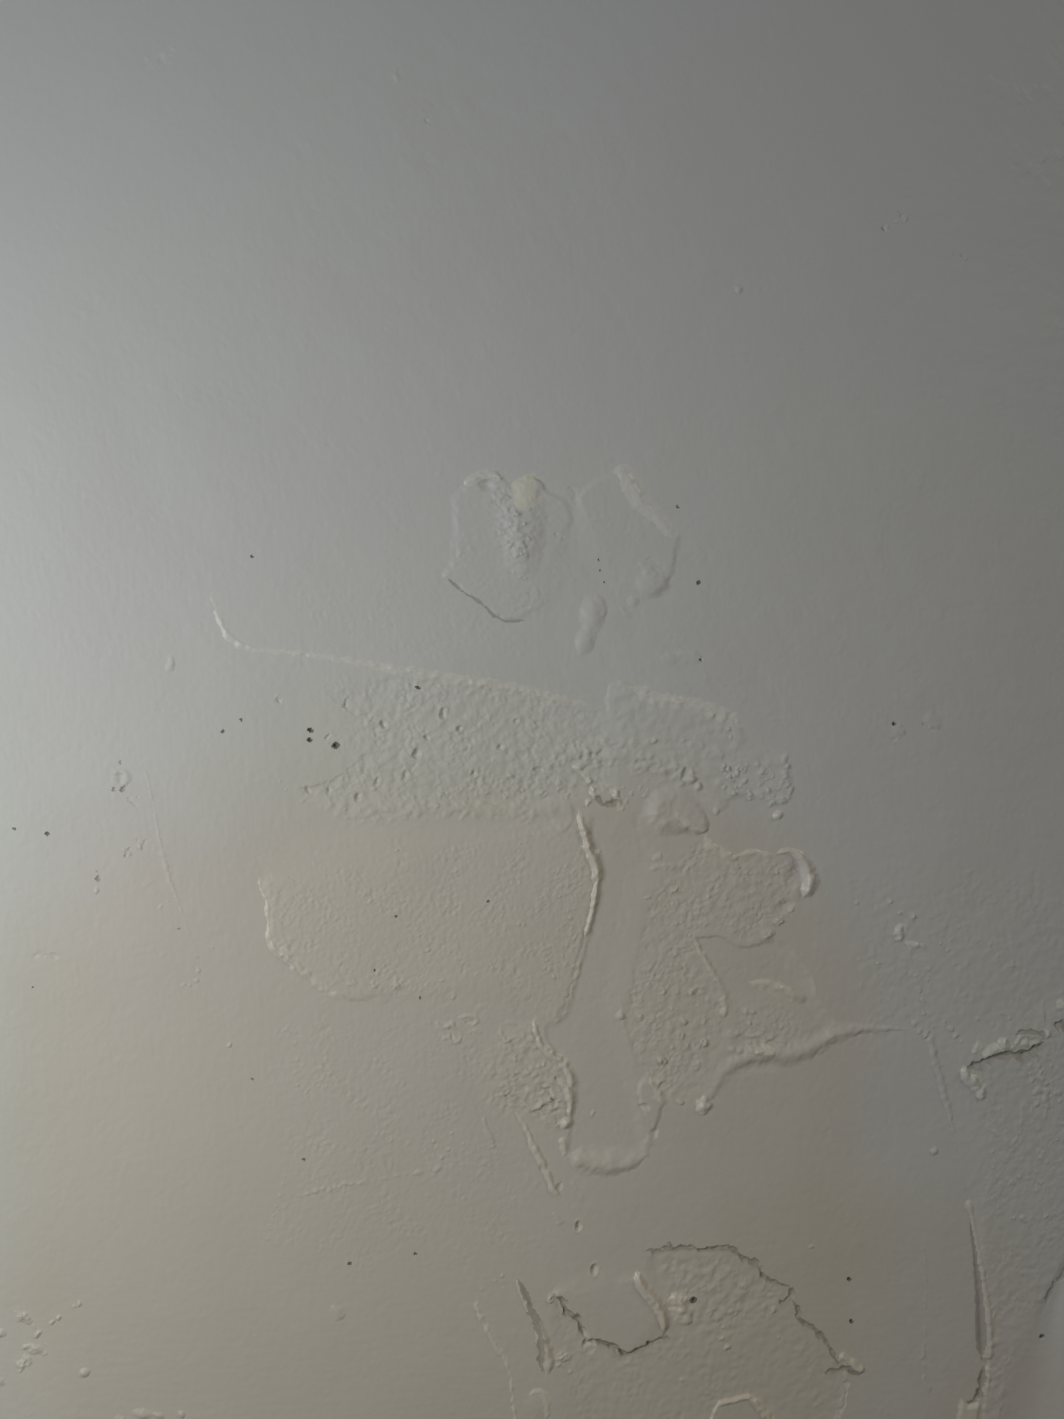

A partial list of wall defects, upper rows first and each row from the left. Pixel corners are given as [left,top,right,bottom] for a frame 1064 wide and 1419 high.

peeling [572,764,625,814]